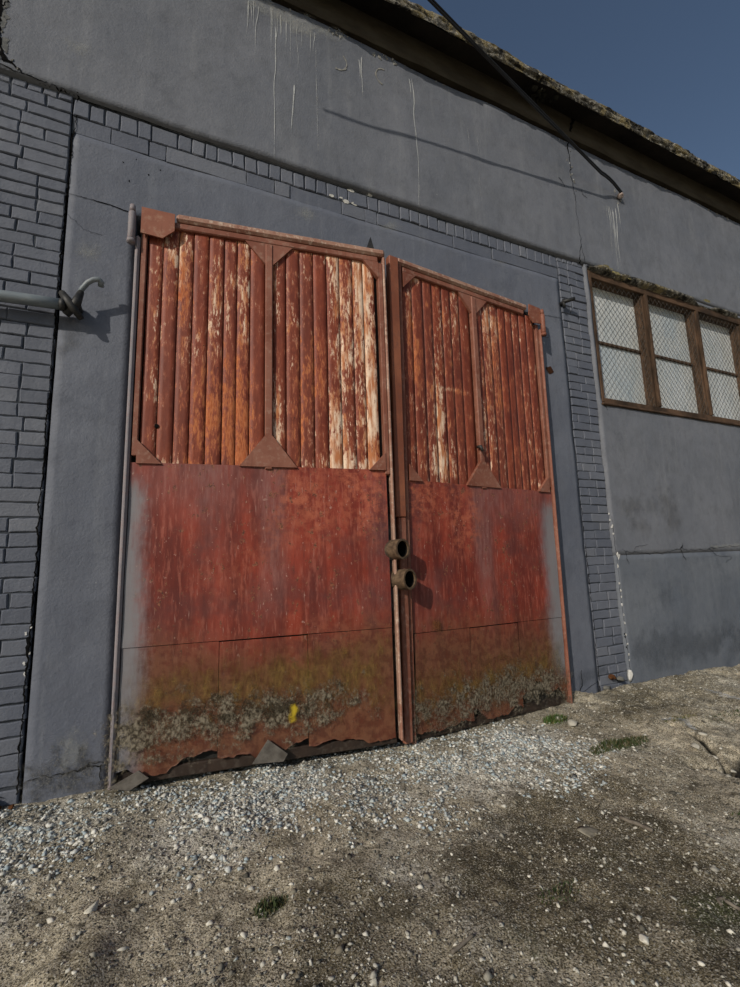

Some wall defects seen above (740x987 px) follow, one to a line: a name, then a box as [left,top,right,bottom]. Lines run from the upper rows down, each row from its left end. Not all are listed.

crack [0,0,273,798]